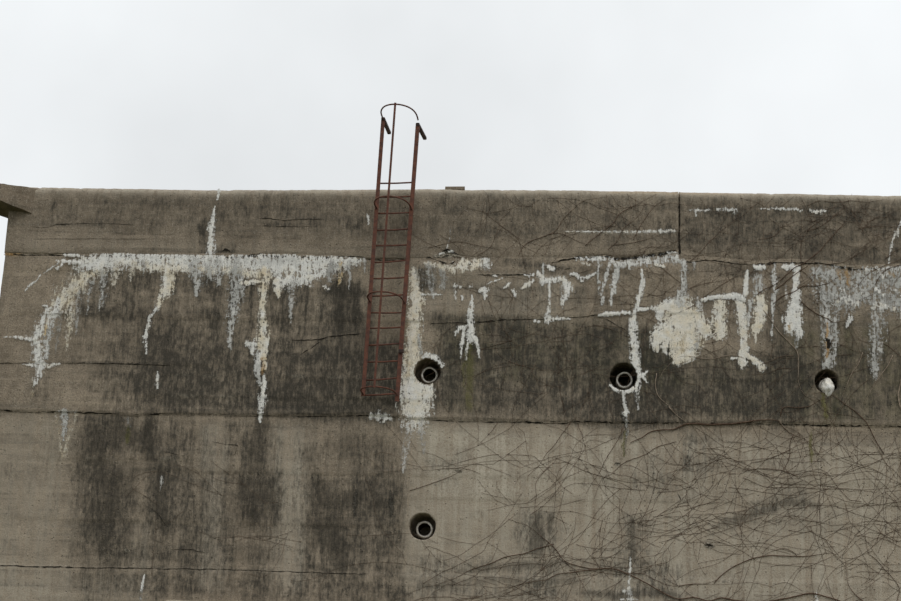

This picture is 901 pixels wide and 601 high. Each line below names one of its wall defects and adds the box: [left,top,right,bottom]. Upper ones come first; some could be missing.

damp [55,409,78,457]
damp [3,189,367,423]
damp [369,220,901,473]